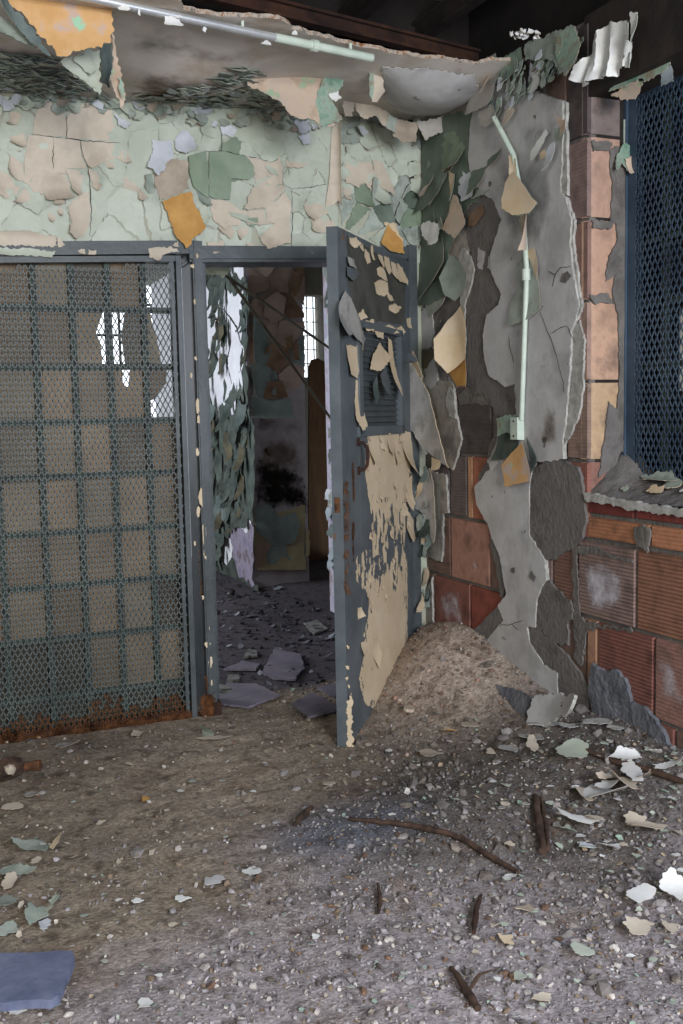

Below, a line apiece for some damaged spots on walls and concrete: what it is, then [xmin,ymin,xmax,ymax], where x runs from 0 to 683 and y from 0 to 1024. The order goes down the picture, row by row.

crack [32,117,116,234]
crack [207,135,325,244]
peeling [0,0,683,801]
water stain [258,467,303,507]
corrosion [0,677,214,744]